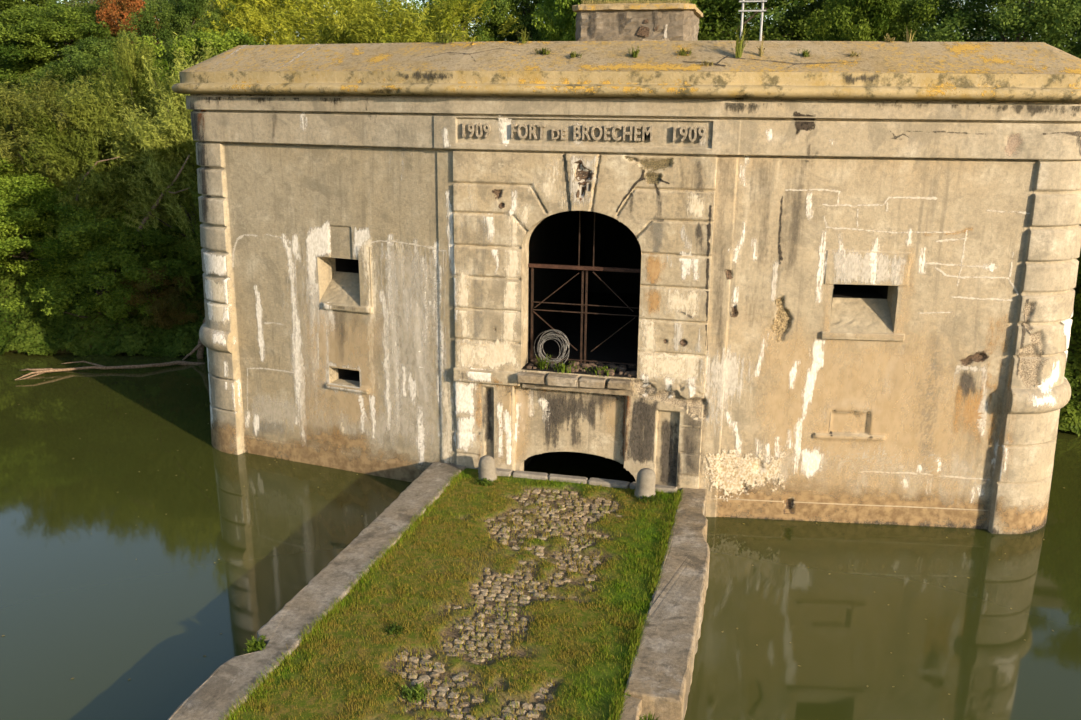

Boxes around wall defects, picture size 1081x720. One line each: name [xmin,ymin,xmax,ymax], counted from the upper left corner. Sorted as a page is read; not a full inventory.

damp [561,123,596,209]
spalling [575,160,594,198]
crack [616,170,670,212]
damp [483,161,558,347]
damp [816,229,925,303]
damp [203,251,235,429]
damp [283,191,470,465]
spalling [771,297,793,343]
spalling [959,350,989,366]
damp [462,368,619,465]
damp [627,315,1008,492]
peeling [702,449,795,514]